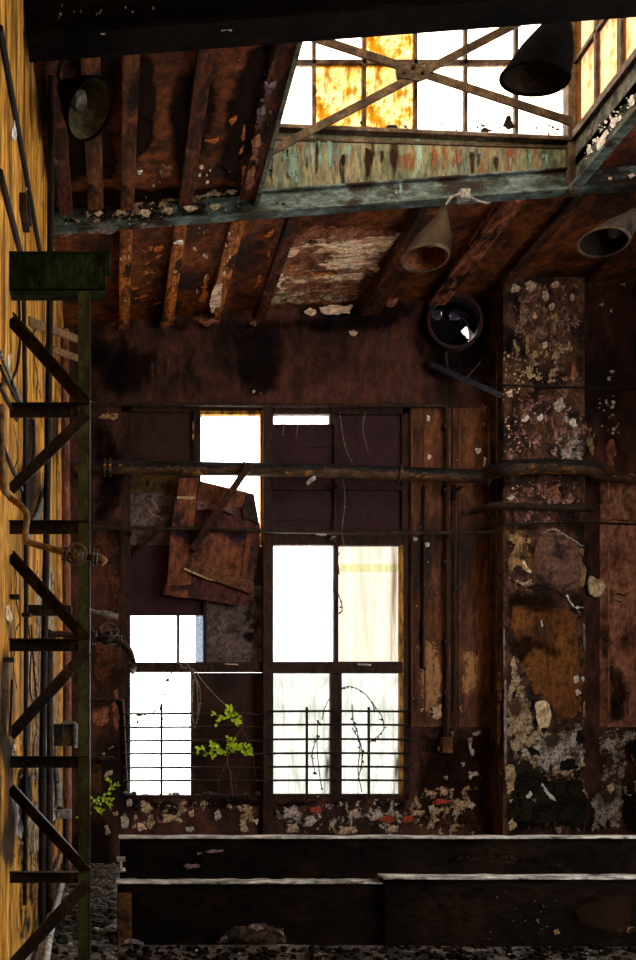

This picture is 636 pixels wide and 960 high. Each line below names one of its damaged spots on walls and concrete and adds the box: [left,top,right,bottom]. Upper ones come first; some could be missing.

peeling [584,95,634,159]
corrosion [334,151,346,183]
corrosion [364,143,415,179]
corrosion [432,145,481,174]
peeling [270,224,400,316]
damp [90,343,159,394]
spalling [503,280,619,467]
peeling [496,595,636,834]
spalling [105,791,260,835]
spalling [274,730,482,835]